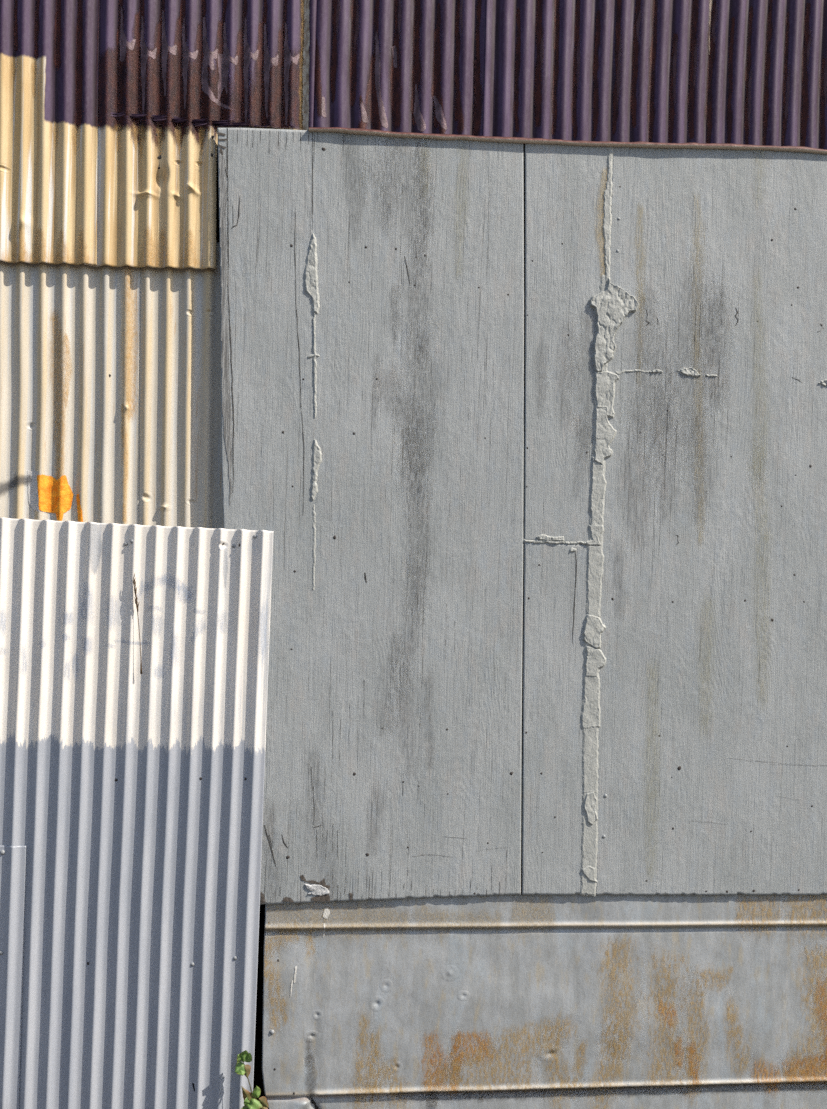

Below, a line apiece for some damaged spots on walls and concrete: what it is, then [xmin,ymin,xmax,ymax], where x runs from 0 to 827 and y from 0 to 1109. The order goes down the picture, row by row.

rust [73,0,83,145]
rust [96,0,338,154]
rust [350,0,482,136]
rust [534,0,559,134]
rust [571,0,580,138]
rust [613,0,657,141]
rust [668,0,716,143]
rust [727,6,753,145]
rust [762,0,773,146]
rust [801,3,827,149]
peeling [677,367,718,377]
peeling [523,147,663,897]